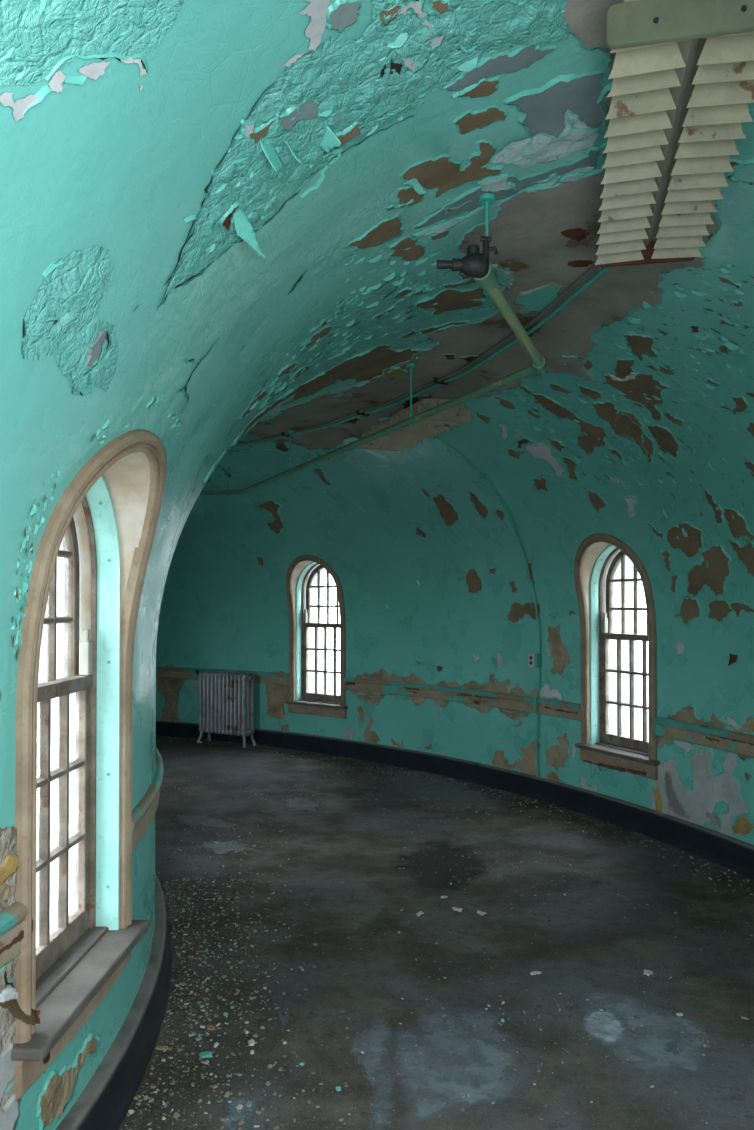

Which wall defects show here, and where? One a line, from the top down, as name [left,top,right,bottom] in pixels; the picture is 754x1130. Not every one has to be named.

peeling [0,92,37,121]
peeling [79,57,146,91]
crack [135,51,415,310]
crack [21,317,75,358]
crack [42,260,64,277]
crack [70,372,93,396]
flaking render [202,0,754,625]
peeling [344,561,576,748]
peeling [491,731,578,783]
flaking render [650,736,754,837]
flaking render [0,957,40,1130]
peeling [36,1032,100,1130]